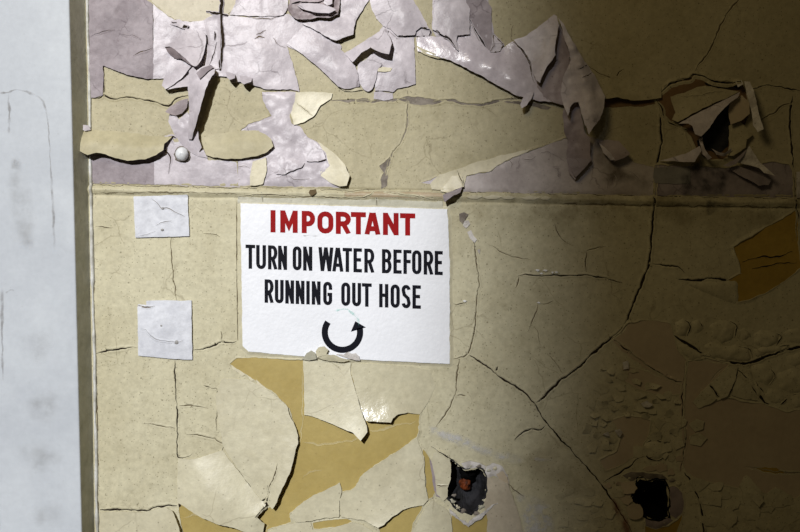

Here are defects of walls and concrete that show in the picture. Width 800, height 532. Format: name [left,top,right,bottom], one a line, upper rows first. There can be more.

peeling [80,0,800,305]
crack [694,0,740,71]
crack [92,184,349,532]
peeling [100,346,524,532]
crack [435,83,800,532]
spalling [604,471,707,532]